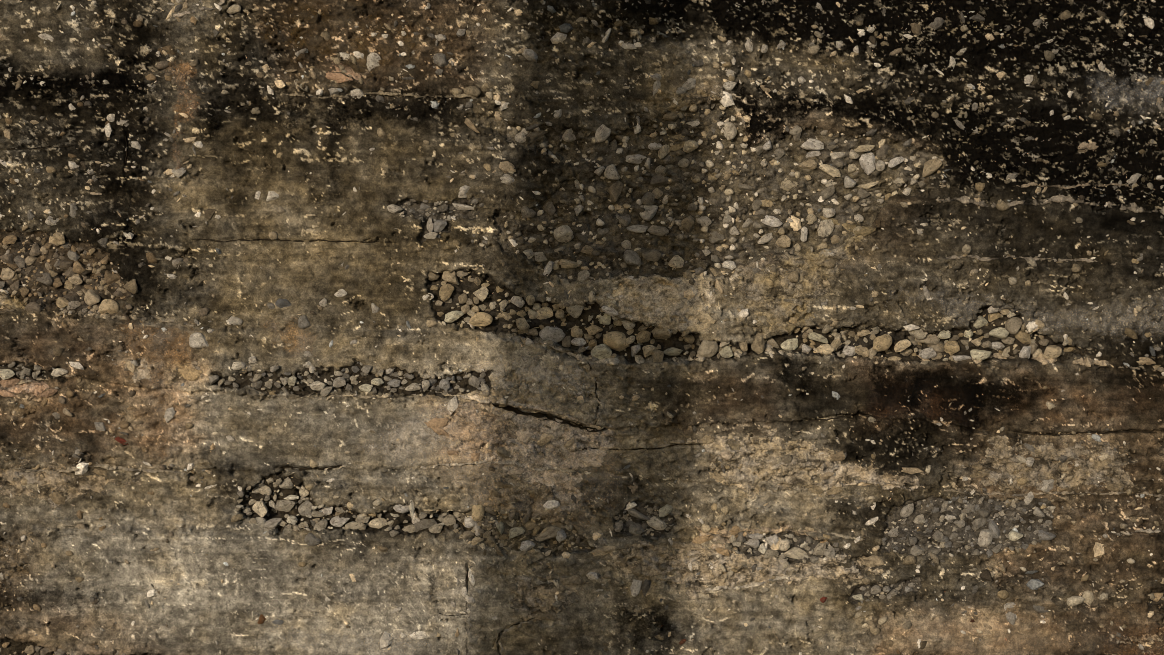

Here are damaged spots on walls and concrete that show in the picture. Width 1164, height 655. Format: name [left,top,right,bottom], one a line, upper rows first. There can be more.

crack [492,363,700,452]